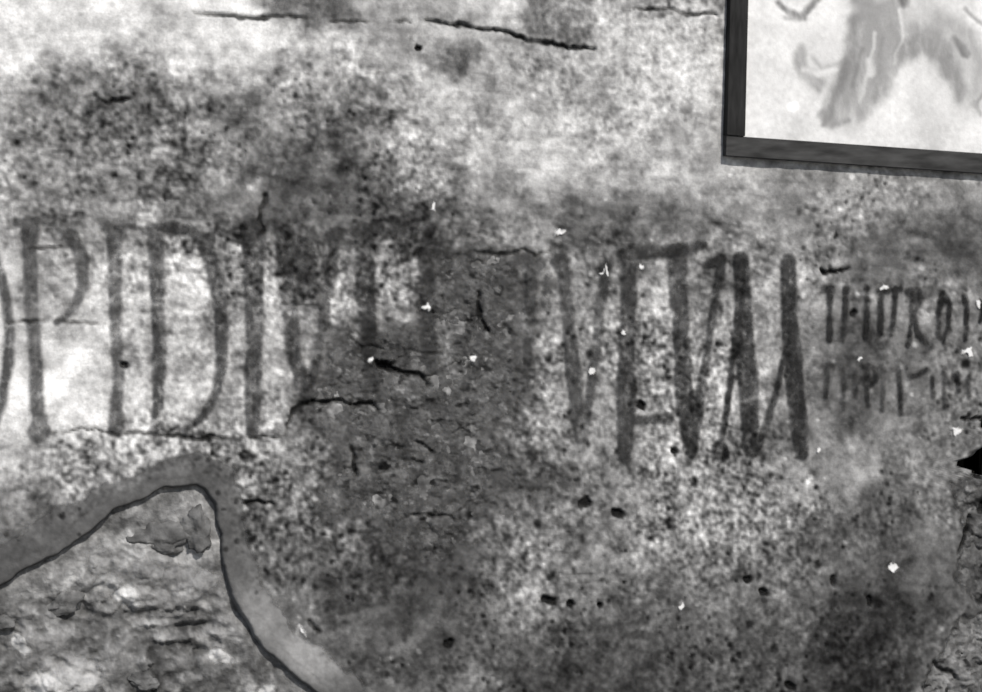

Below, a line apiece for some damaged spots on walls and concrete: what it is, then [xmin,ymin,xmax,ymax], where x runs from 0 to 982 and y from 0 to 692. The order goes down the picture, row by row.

crack [227,14,268,22]
crack [456,25,587,50]
spalling [0,485,313,692]